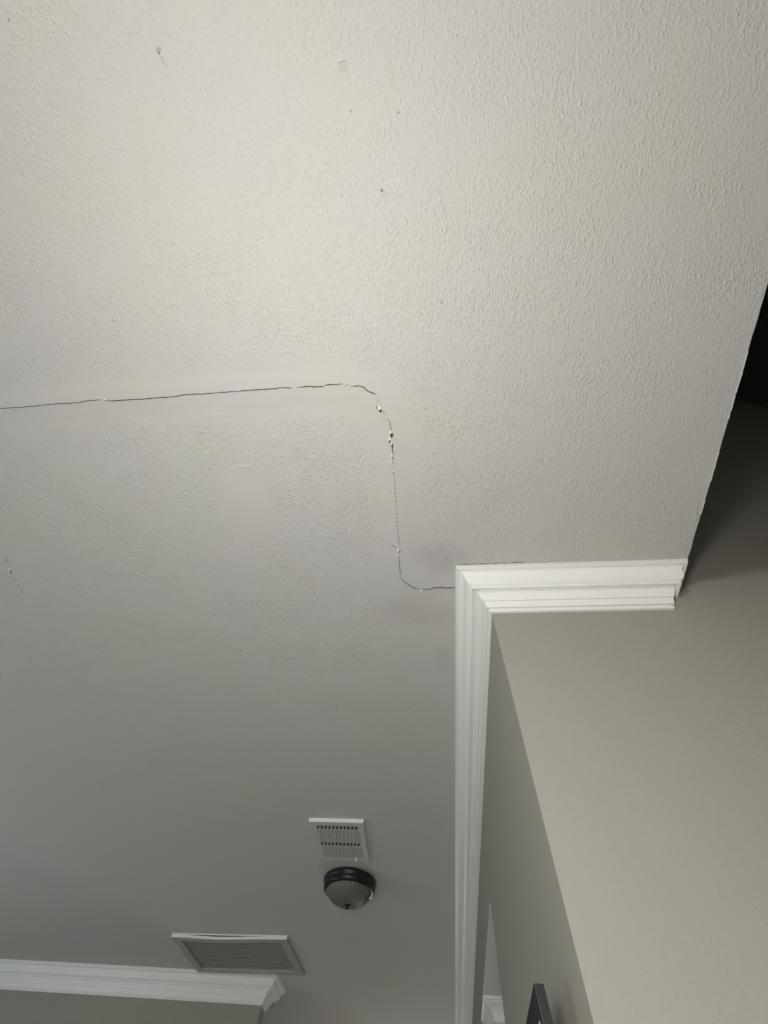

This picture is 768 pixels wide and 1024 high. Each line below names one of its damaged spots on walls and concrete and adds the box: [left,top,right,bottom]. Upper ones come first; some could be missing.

crack [0,384,455,592]